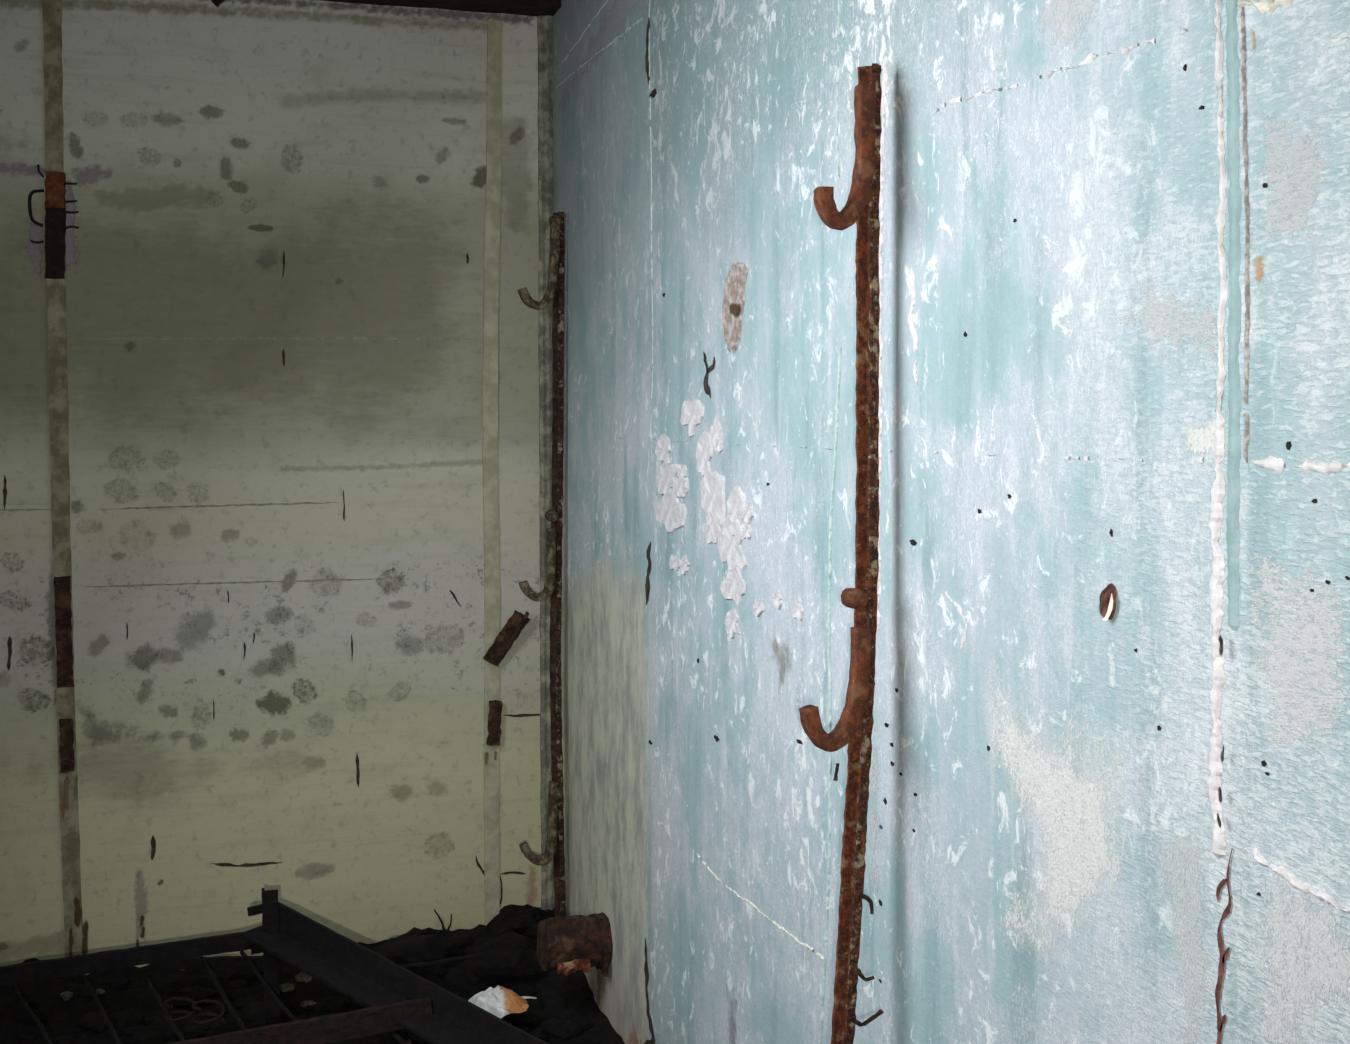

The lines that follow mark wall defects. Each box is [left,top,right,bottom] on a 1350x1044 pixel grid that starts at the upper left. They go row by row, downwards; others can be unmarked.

leakage [470,166,487,188]
spalling [722,259,748,352]
peeling [653,399,804,638]
leakage [7,636,54,671]
leakage [256,679,316,714]
crack [1217,635,1225,655]
corrosion [867,724,880,895]
crack [1215,745,1233,1044]